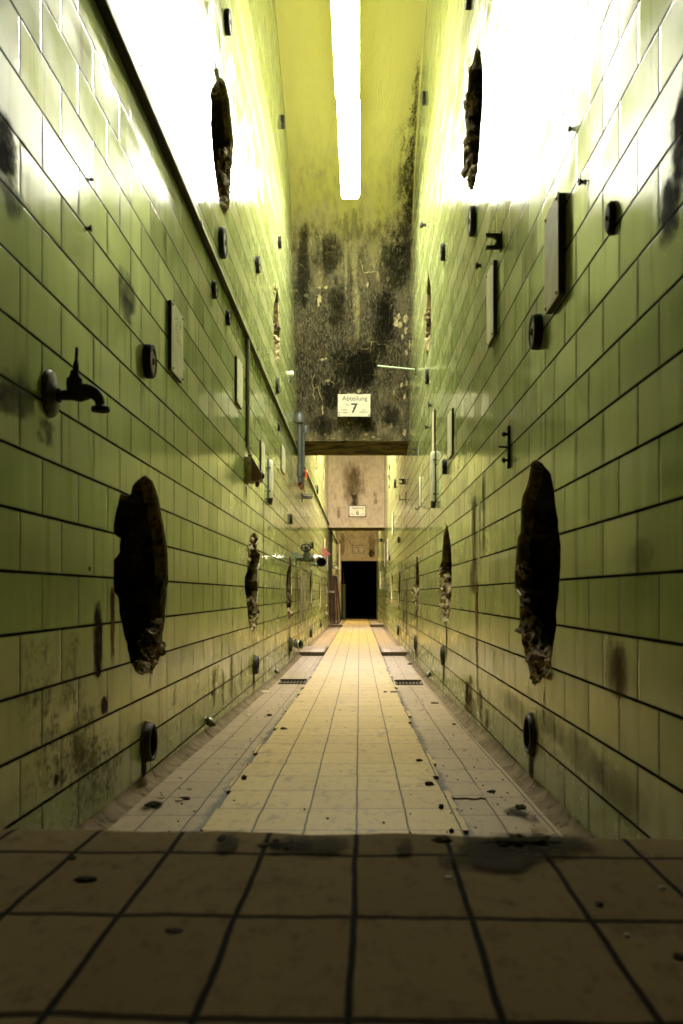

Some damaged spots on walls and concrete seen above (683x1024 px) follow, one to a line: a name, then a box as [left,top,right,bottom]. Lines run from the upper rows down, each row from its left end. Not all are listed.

spalling [210,68,234,215]
spalling [460,47,483,191]
water stain [297,225,310,307]
water stain [313,72,420,435]
spalling [113,475,168,676]
spalling [244,532,261,632]
spalling [438,524,452,657]
spalling [514,460,561,685]
water stain [213,658,255,703]